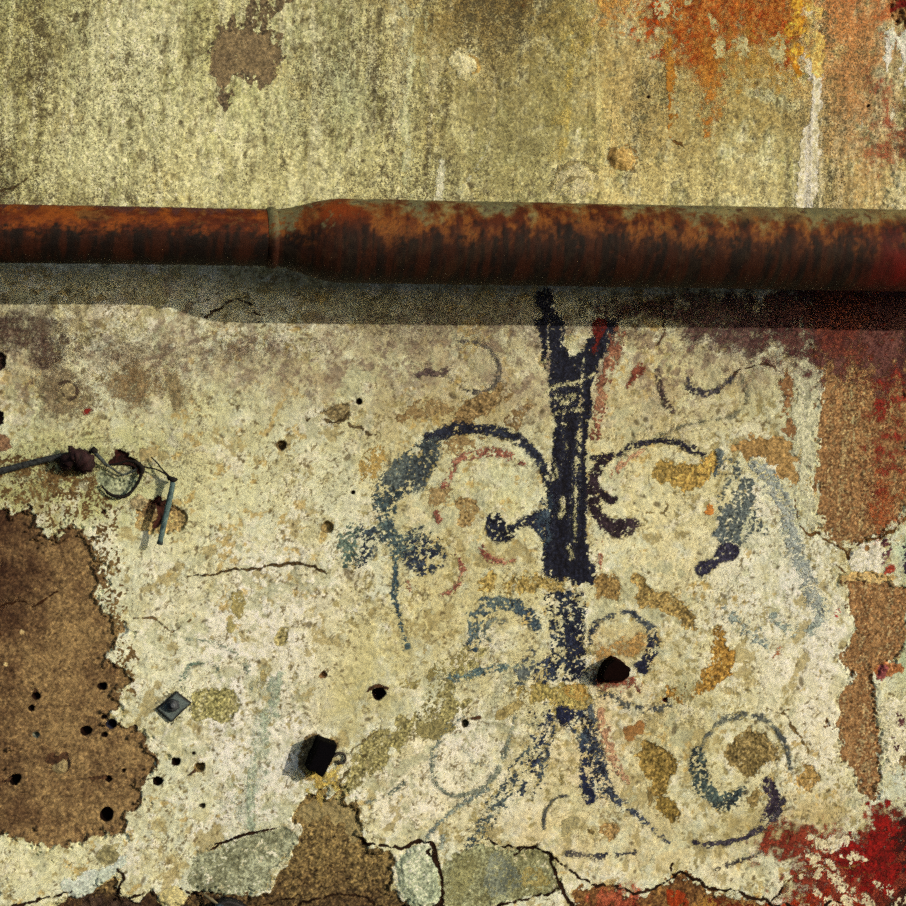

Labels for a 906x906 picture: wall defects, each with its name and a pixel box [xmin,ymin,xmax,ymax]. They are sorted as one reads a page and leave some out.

rust [590,0,816,138]
rust [858,66,905,165]
crack [187,561,327,578]
peeling [593,573,698,631]
spalling [724,290,906,801]
spalling [0,411,568,906]
peeling [662,625,736,705]
peeling [623,720,682,823]
crack [12,891,73,906]
crack [117,868,144,899]
crack [359,837,445,906]
crack [485,839,866,906]